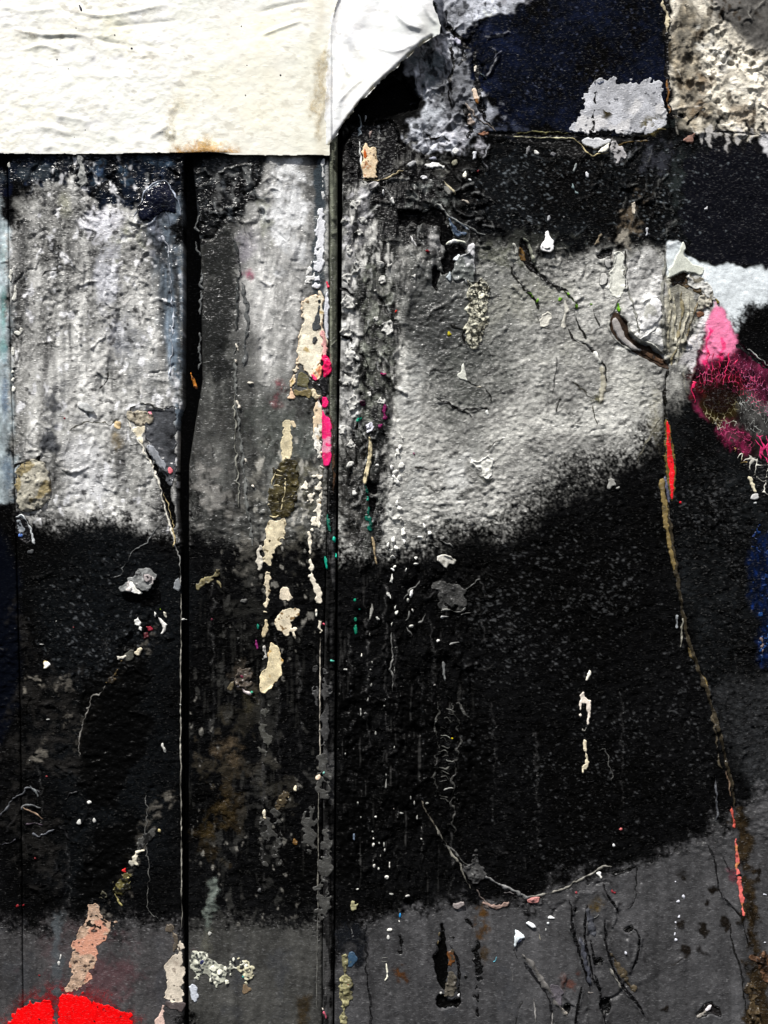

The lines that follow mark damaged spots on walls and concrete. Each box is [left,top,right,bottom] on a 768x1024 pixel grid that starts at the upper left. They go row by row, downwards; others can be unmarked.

peeling [569,76,668,135]
corrosion [176,142,236,153]
peeling [280,420,296,461]
peeling [64,890,117,992]